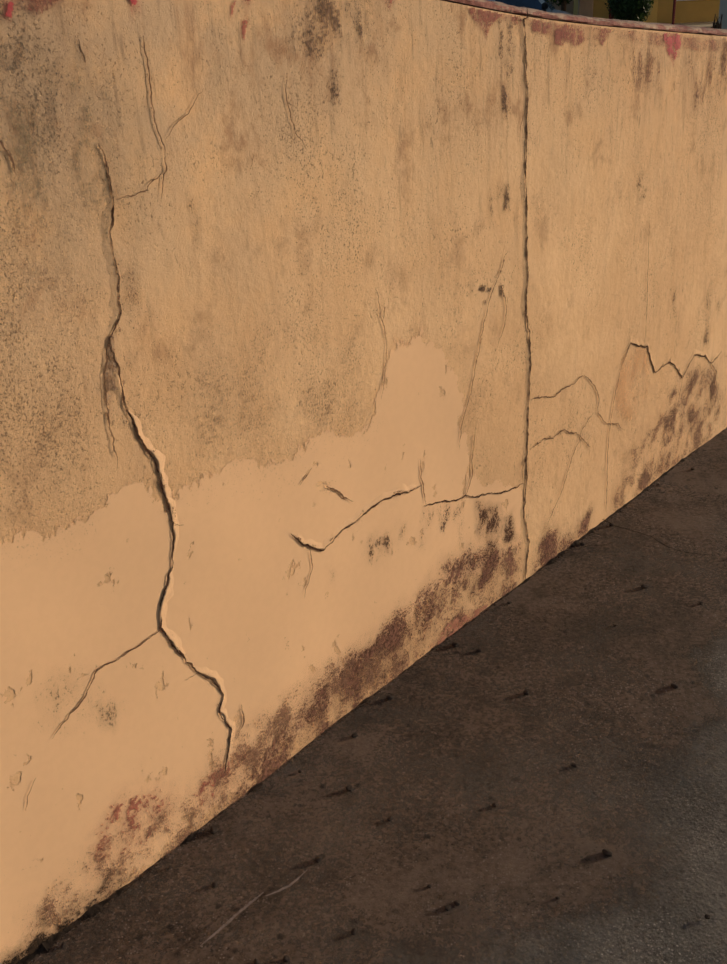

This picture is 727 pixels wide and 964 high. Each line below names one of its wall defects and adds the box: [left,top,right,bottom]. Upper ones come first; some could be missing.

crack [69,23,87,63]
crack [52,36,245,776]
peeling [0,320,523,964]
damp [25,502,522,942]
crack [291,10,721,591]
damp [534,507,593,573]
damp [613,365,721,510]